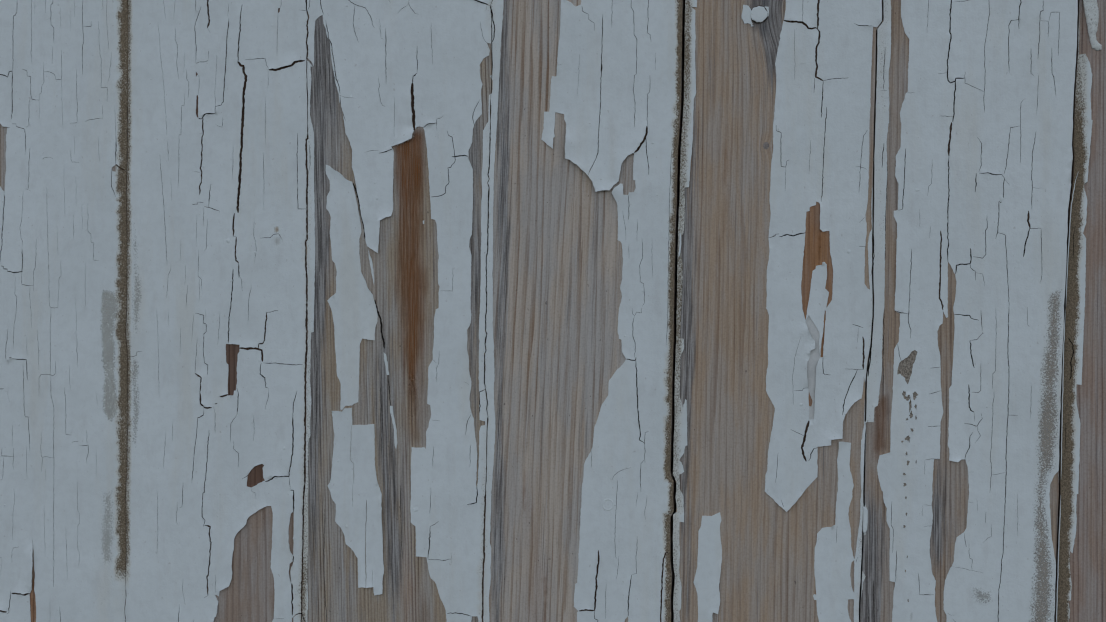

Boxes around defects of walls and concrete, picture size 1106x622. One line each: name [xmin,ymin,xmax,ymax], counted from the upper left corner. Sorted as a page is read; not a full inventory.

crack [0,2,107,406]
peeling [214,506,275,622]
crack [157,0,386,622]
peeling [307,15,447,622]
crack [379,5,491,622]
peeling [467,0,636,622]
crack [776,421,815,478]
peeling [679,0,918,622]
crack [781,0,841,198]
crack [792,0,1060,622]
peeling [930,262,969,622]
peeling [1068,0,1106,622]